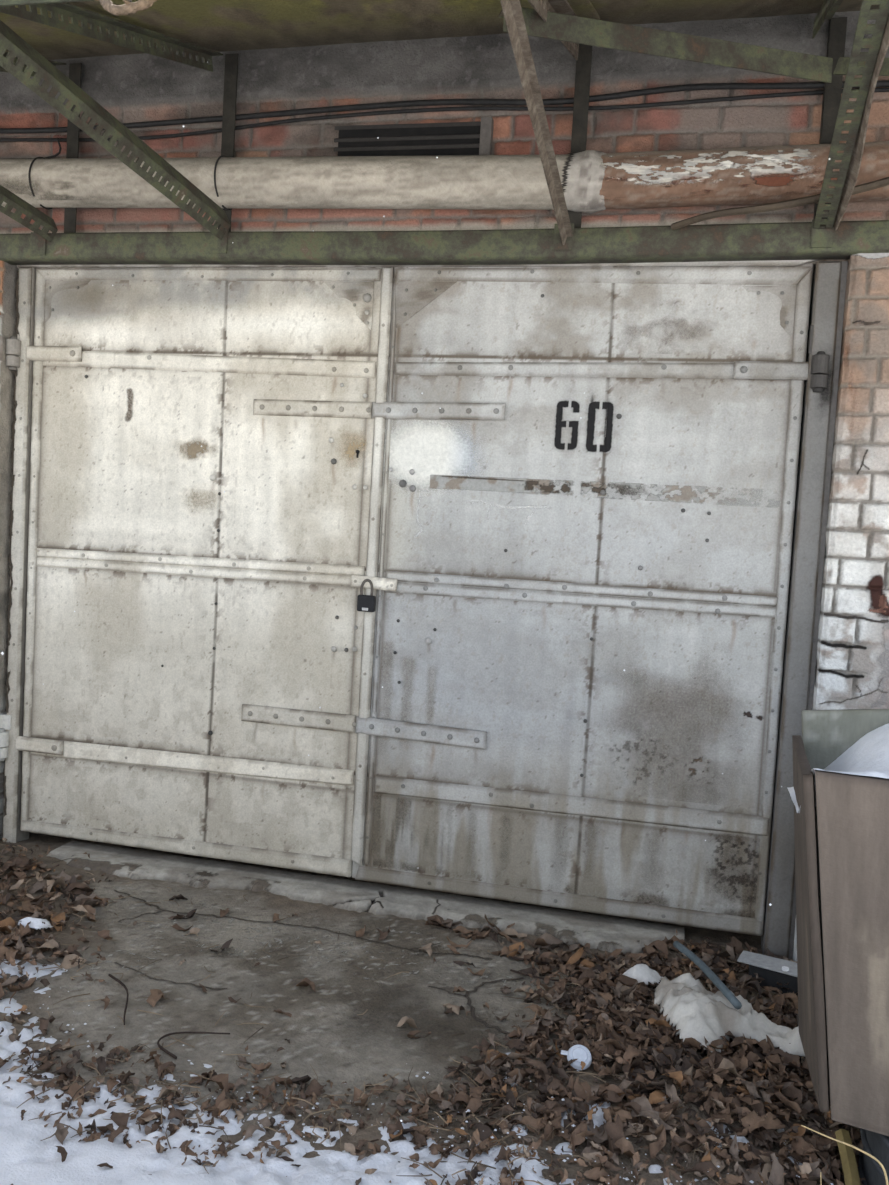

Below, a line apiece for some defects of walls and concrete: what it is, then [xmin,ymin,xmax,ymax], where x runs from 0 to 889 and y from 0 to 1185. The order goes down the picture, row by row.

peeling [604,148,811,184]
rust [180,441,208,459]
rust [713,836,759,898]
crack [114,890,523,1035]